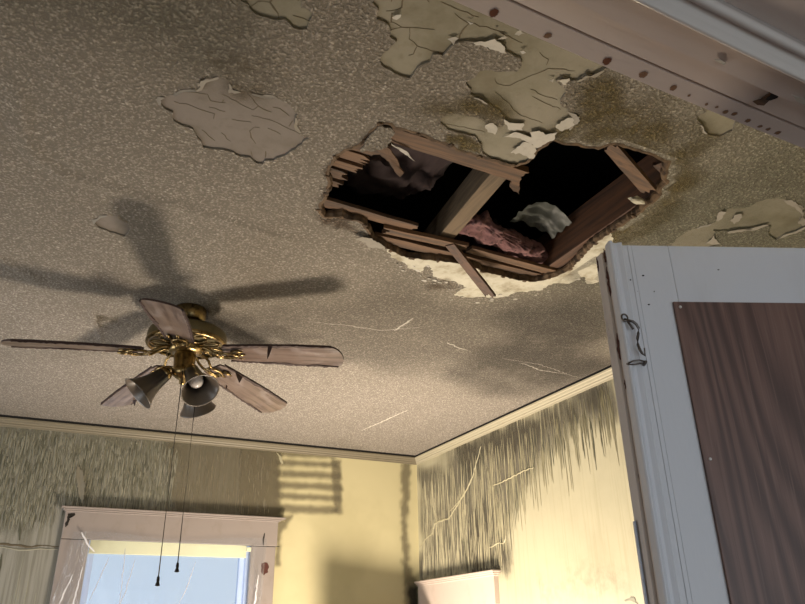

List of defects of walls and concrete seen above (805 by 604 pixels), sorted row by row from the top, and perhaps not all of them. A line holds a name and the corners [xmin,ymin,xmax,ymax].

peeling [370,0,604,164]
peeling [355,233,613,304]
peeling [671,198,805,247]
peeling [0,427,272,530]
crack [0,365,612,547]
crack [0,523,90,570]